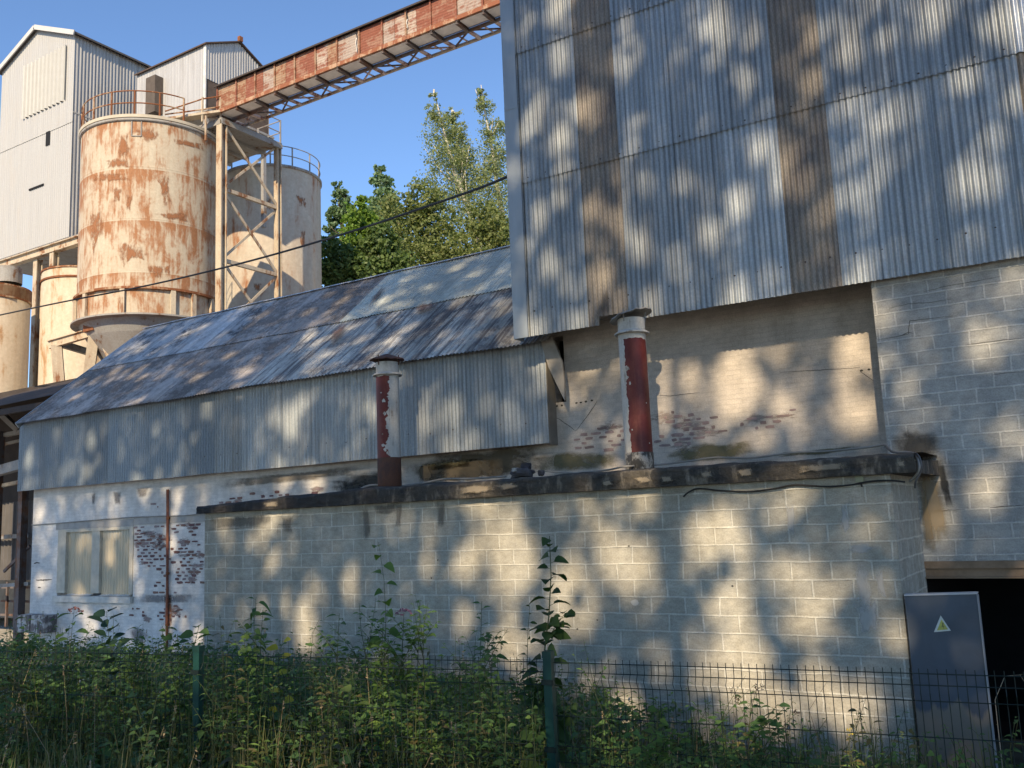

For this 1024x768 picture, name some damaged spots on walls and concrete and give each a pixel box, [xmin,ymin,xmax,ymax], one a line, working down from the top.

rust [91,213,102,253]
rust [96,129,158,209]
rust [120,243,170,277]
rust [158,177,186,221]
crack [879,276,1000,340]
peeling [376,375,391,458]
peeling [574,337,727,452]
peeling [740,409,796,430]
damp [897,433,951,502]
peeling [129,523,205,622]